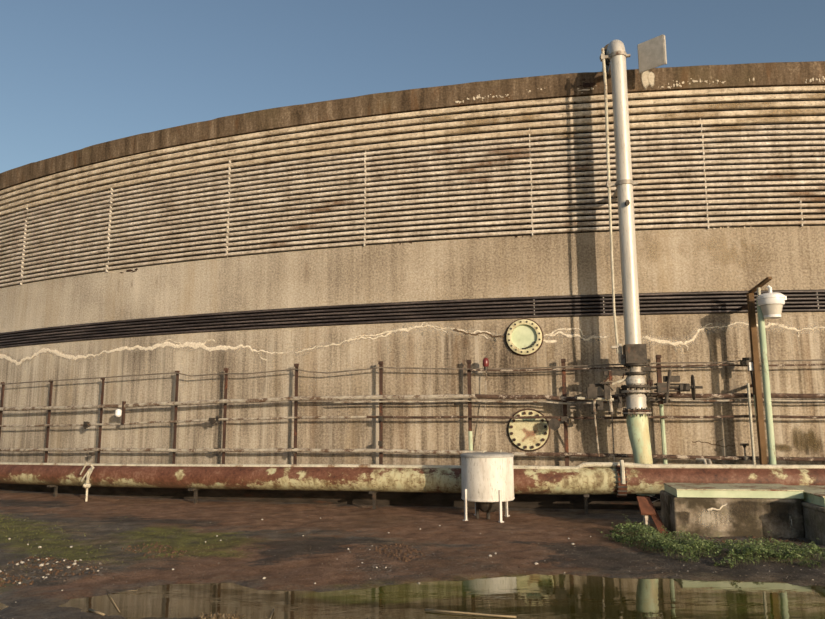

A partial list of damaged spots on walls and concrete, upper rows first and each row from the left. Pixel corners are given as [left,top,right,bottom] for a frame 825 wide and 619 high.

crack [0,322,504,366]
crack [543,326,607,343]
crack [643,322,825,351]